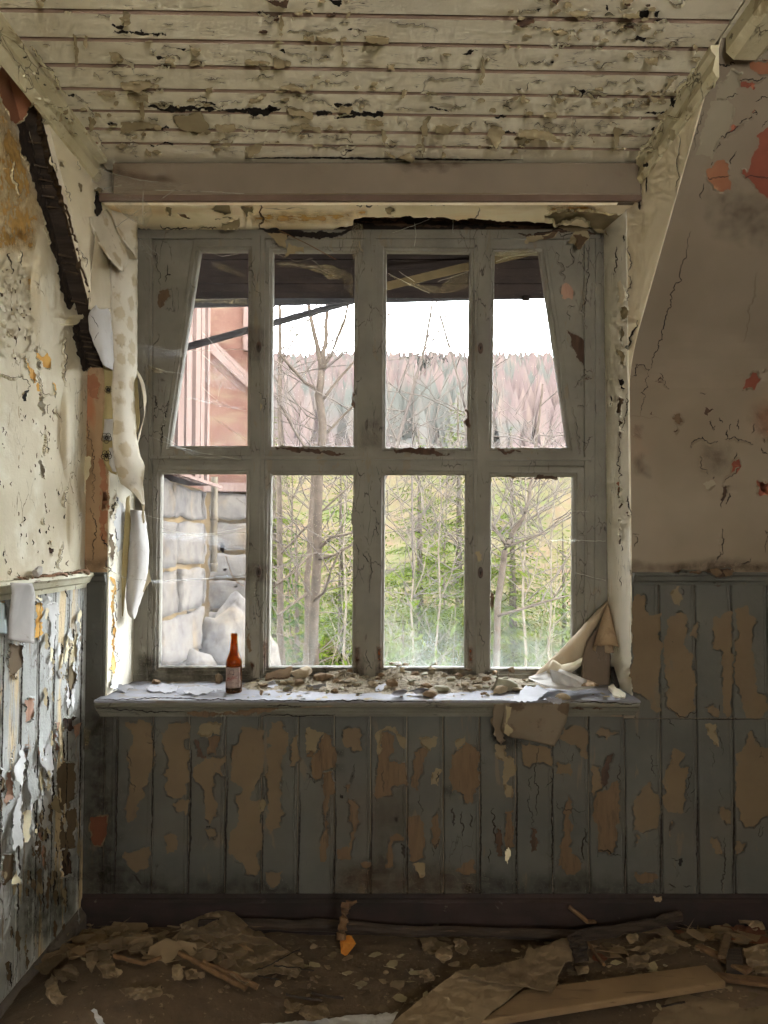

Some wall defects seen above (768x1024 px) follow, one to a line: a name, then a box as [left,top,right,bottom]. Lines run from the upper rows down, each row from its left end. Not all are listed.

flaking render [0,0,701,399]
peeling [696,99,768,200]
peeling [0,259,76,568]
crack [518,228,690,550]
peeling [756,479,768,497]
peeling [0,591,109,971]
peeling [122,719,283,890]
crack [432,808,496,859]
peeling [494,827,511,864]
crack [527,748,621,859]
peeling [631,748,690,837]
peeling [718,730,768,829]